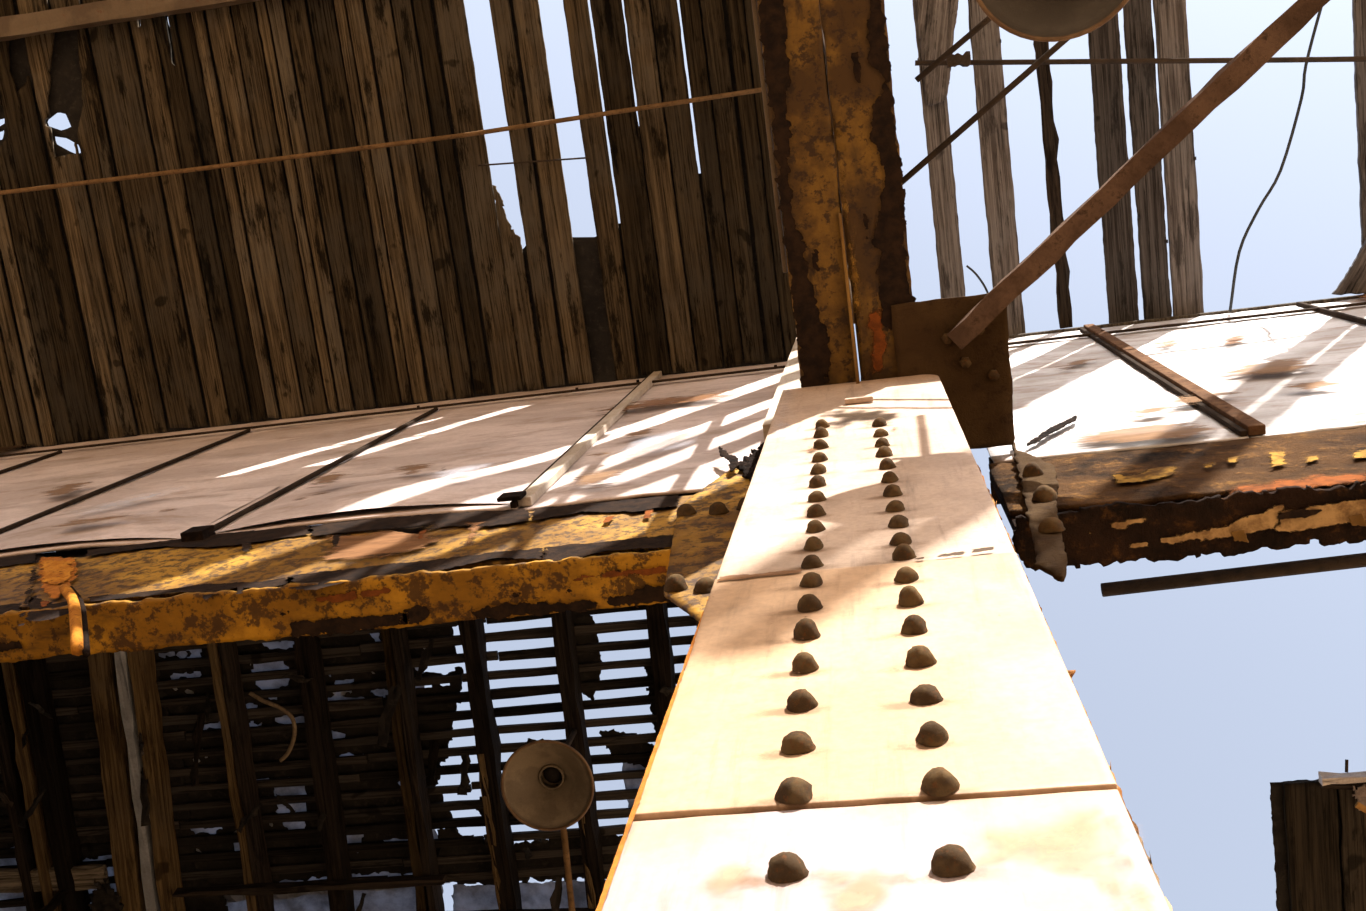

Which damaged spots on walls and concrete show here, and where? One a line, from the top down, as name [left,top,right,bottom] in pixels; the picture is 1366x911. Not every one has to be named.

corrosion [850,244,887,372]
corrosion [826,410,898,430]
corrosion [737,442,764,482]
peeling [1269,450,1286,467]
peeling [1112,466,1177,483]
corrosion [1235,474,1366,492]
peeling [1111,499,1366,548]
corrosion [1277,509,1322,520]
corrosion [717,570,802,581]
corrosion [596,600,708,911]